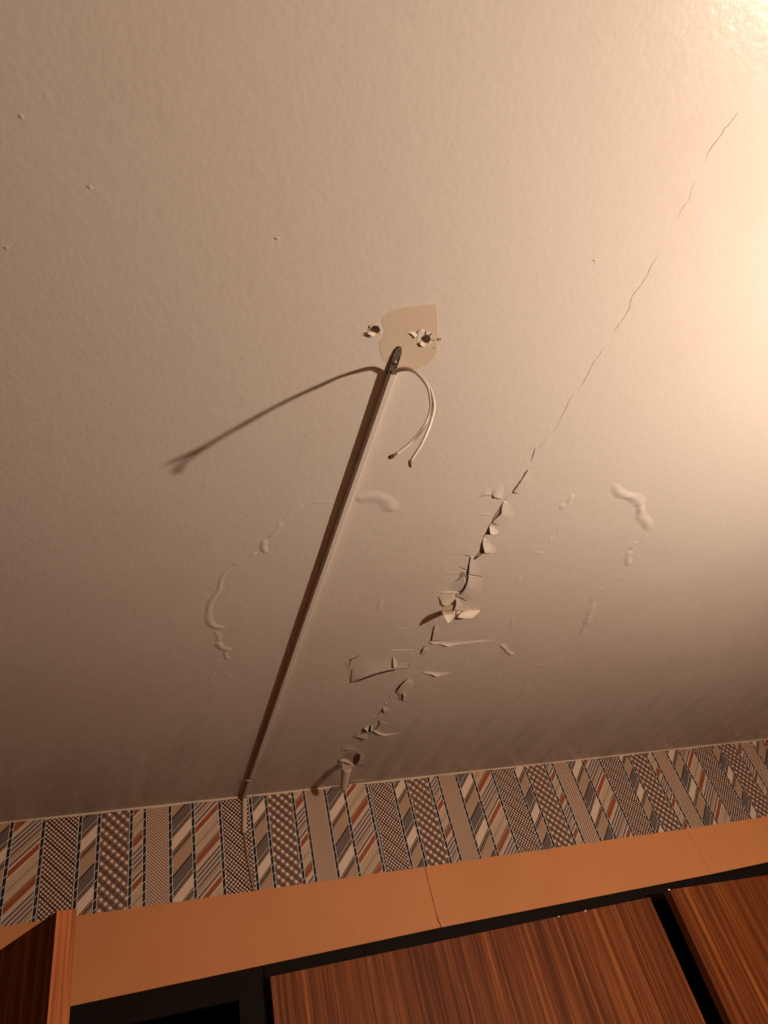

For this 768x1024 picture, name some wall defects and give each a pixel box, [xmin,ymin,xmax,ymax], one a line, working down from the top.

crack [512,254,659,494]
peeling [428,484,515,628]
peeling [429,639,515,655]
peeling [330,656,451,791]